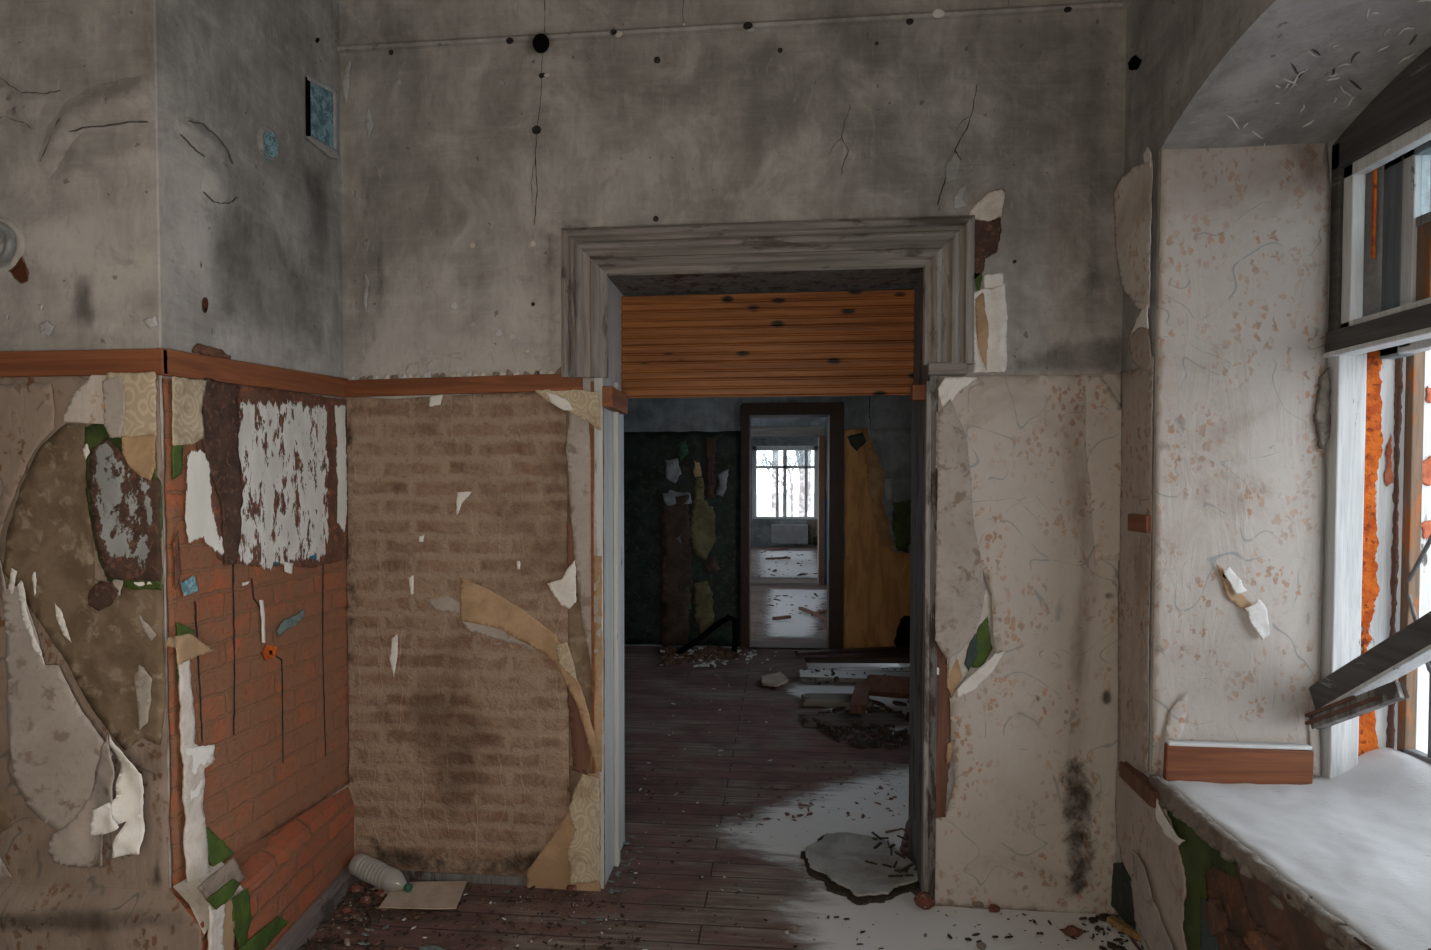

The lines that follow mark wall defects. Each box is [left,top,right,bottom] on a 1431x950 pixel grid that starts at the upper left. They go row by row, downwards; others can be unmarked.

crack [937,85,977,209]
flaking render [968,189,1017,373]
flaking render [192,343,231,359]
flaking render [348,352,561,380]
flaking render [83,377,570,889]
flaking render [947,582,991,696]
peeling [1168,811,1239,950]